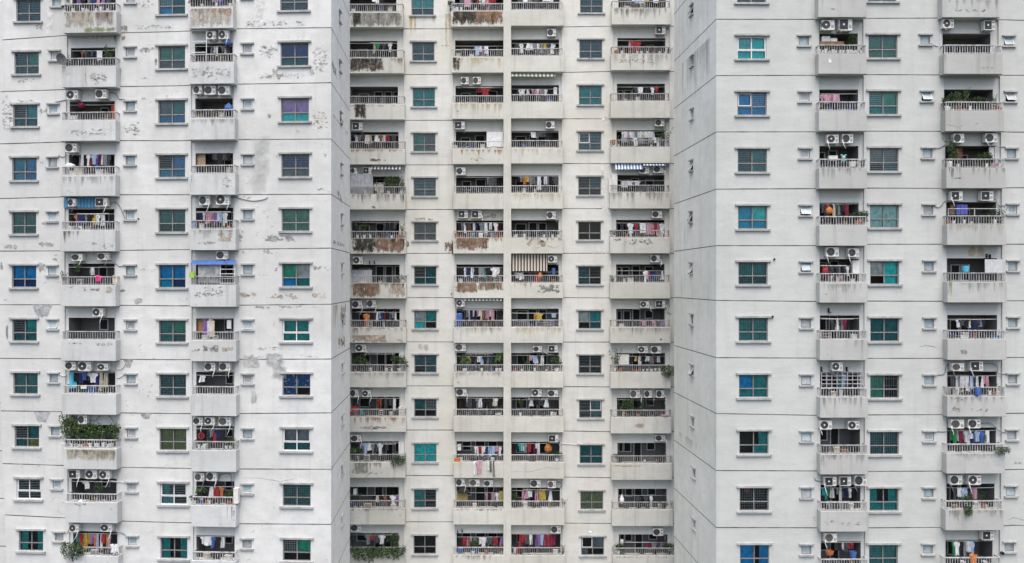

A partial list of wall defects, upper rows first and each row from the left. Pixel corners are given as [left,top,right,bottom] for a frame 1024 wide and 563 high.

leakage [453,11,477,23]
leakage [350,58,402,71]
mould [353,239,375,253]